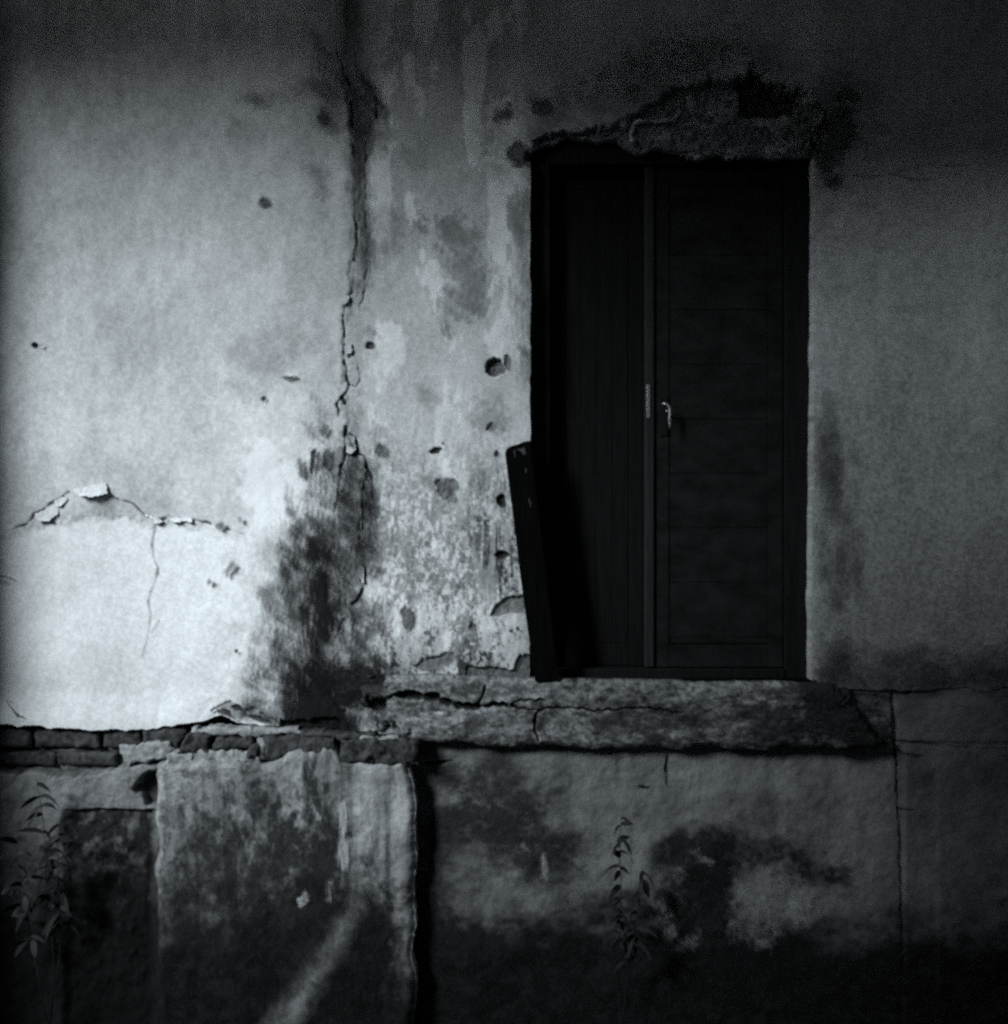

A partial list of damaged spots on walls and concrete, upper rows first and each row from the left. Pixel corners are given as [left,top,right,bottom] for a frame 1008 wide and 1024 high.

crack [336,52,379,531]
peeling [35,483,108,521]
crack [116,498,166,577]
leakage [241,449,393,732]
crack [342,566,366,623]
peeling [491,596,525,616]
peeling [466,655,530,678]
spalling [0,701,421,766]
crack [391,687,663,733]
leakage [303,760,348,870]
leakage [420,758,572,879]
leakage [158,810,1008,1024]